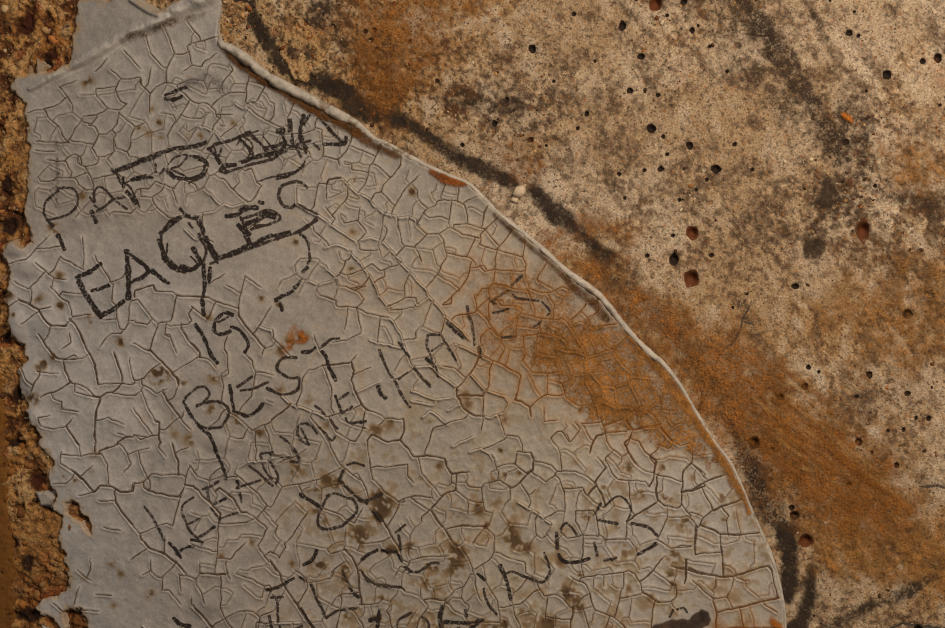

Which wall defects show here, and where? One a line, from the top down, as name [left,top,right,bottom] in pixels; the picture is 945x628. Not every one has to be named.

spalling [221,0,253,43]
spalling [271,15,337,82]
corrosion [344,0,446,109]
damp [233,0,635,296]
spalling [0,0,79,628]
crack [9,23,780,628]
damp [494,213,609,322]
corrosion [479,252,945,580]
spalling [68,502,92,531]
damp [724,414,816,628]
damp [822,574,935,628]
crack [890,620,940,628]